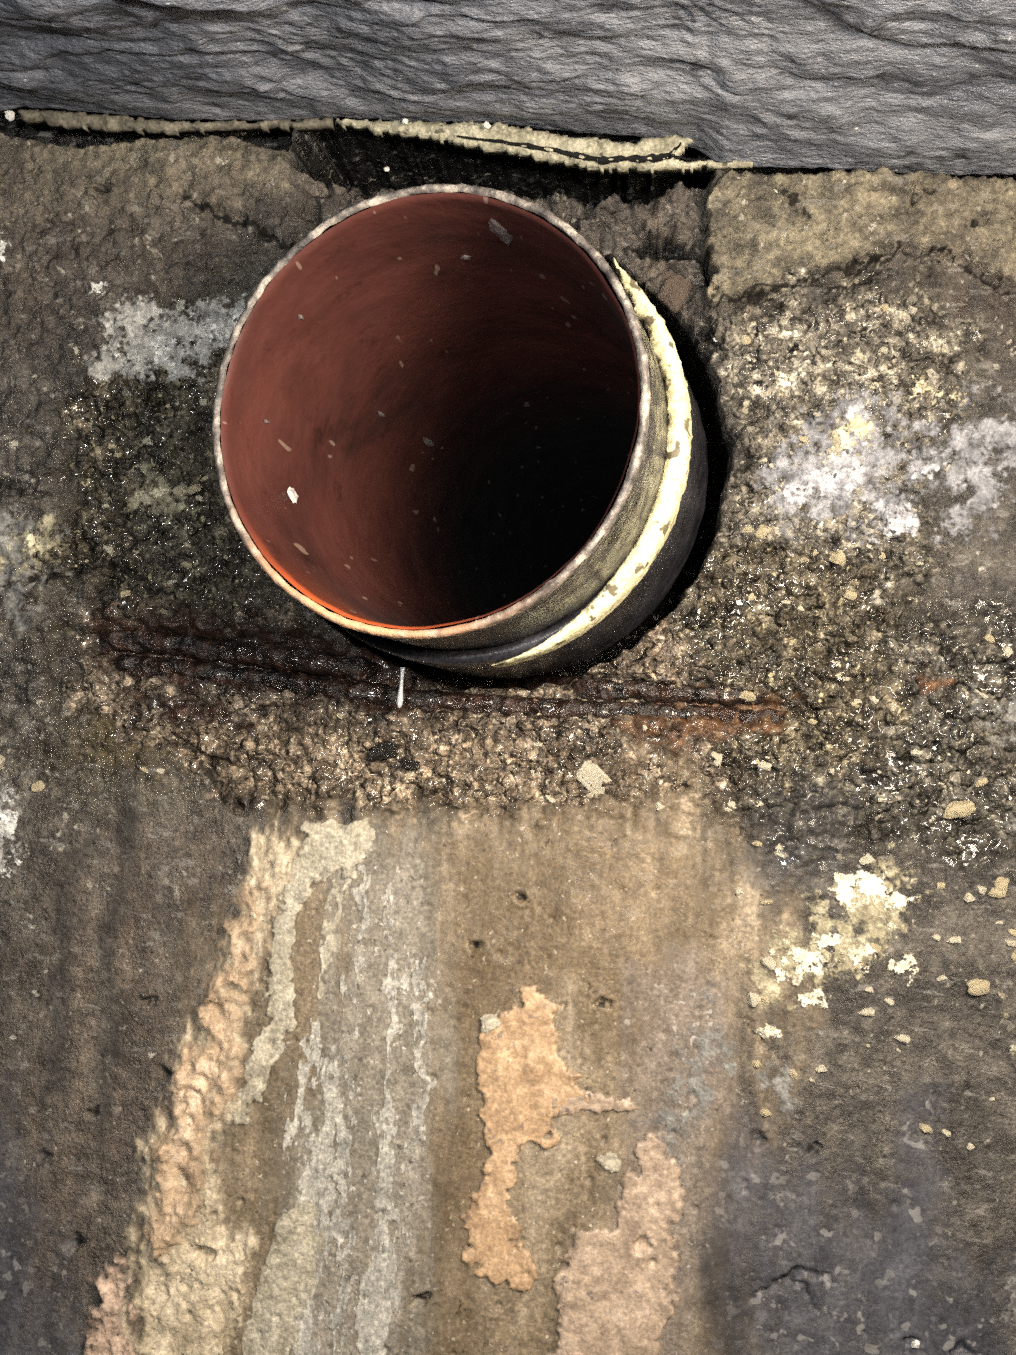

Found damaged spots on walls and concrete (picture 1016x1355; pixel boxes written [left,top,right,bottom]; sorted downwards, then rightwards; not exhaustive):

water stain [83,281,246,396]
water stain [755,375,1016,546]
rust [86,602,435,736]
rust [615,685,786,754]
water stain [0,767,26,886]
water stain [195,753,929,1355]
peeling [461,986,686,1355]